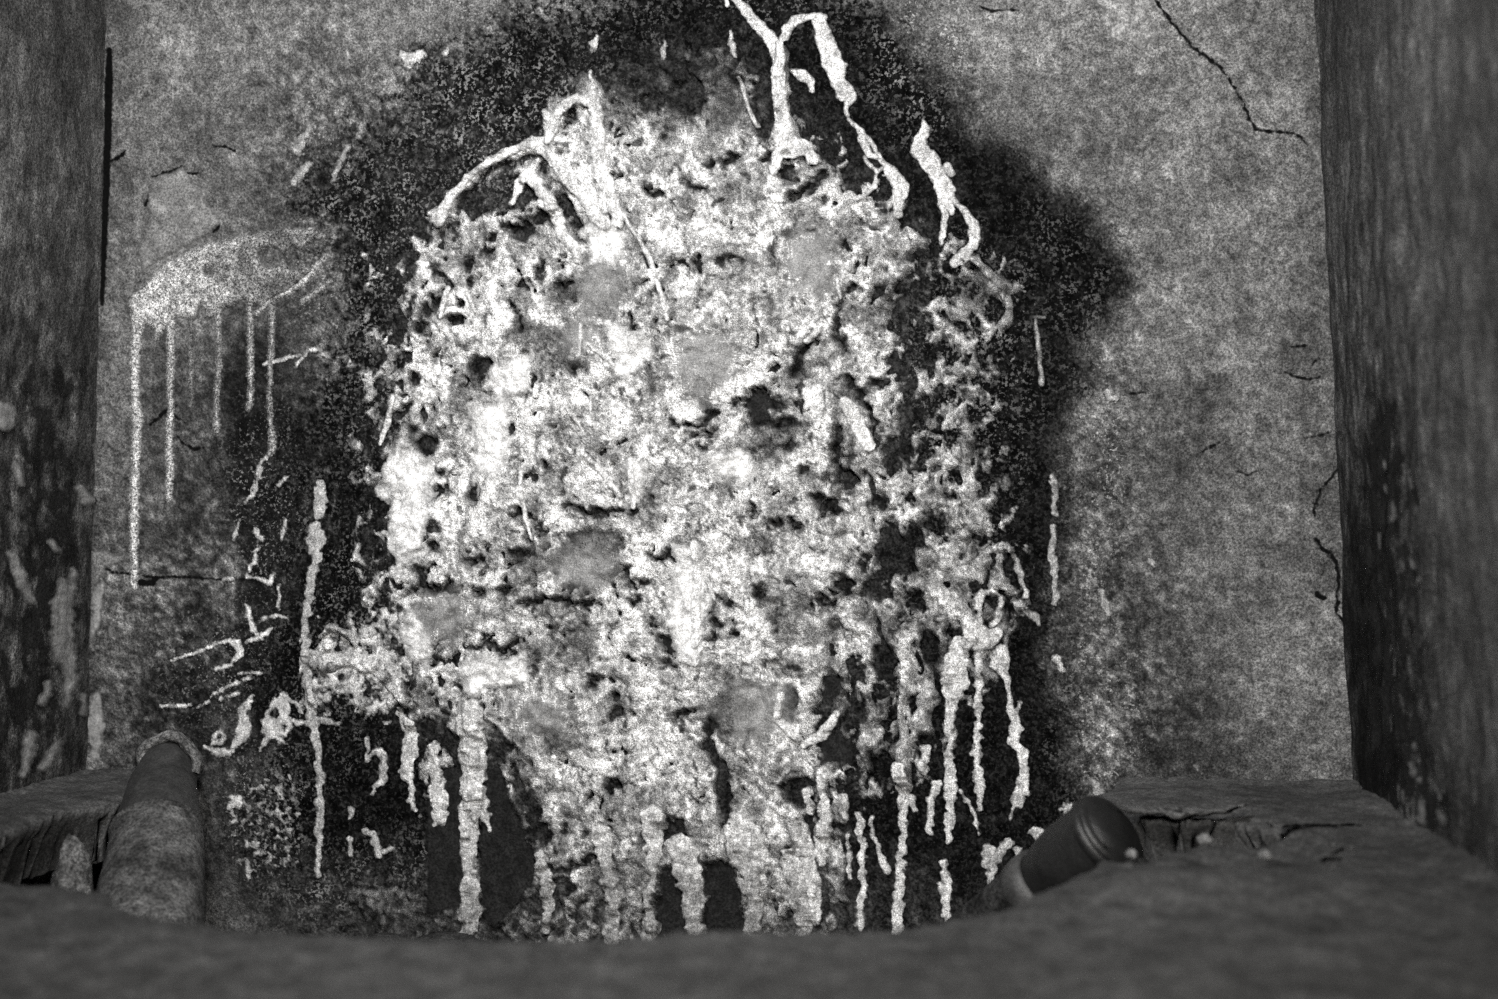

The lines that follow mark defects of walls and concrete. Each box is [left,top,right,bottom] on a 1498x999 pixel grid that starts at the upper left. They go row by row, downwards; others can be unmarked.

damp [128,0,1138,944]
crack [1156,0,1308,145]